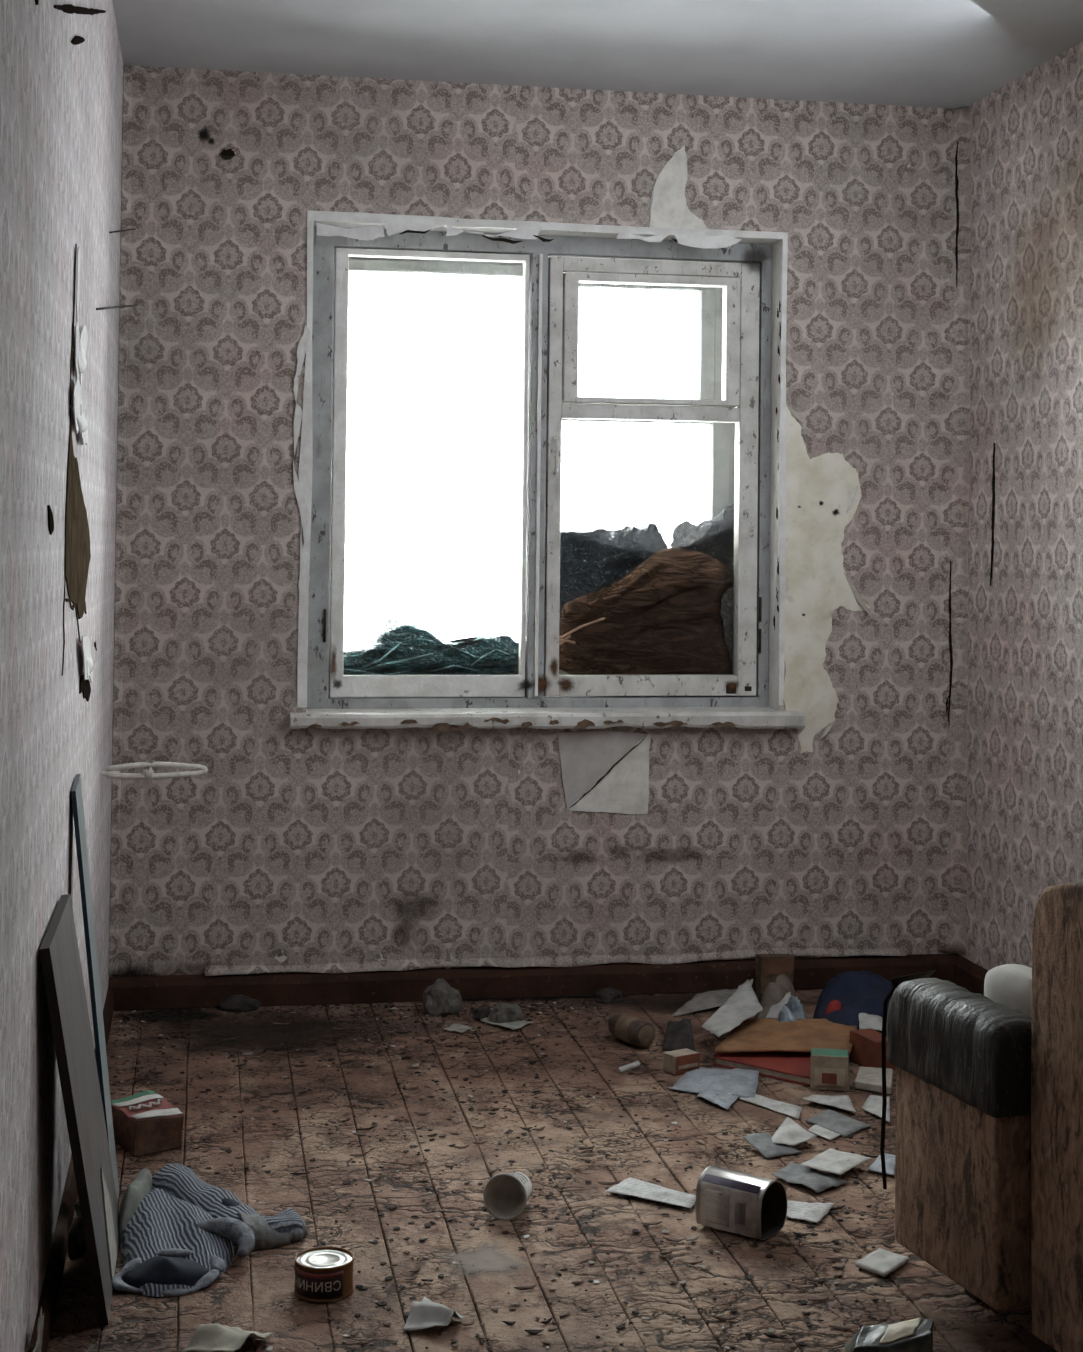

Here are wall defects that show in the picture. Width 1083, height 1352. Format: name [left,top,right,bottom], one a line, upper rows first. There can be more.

peeling [317,222,554,244]
peeling [616,145,742,249]
crack [953,142,961,288]
peeling [773,403,871,753]
crack [945,561,953,725]
crack [988,443,996,586]
peeling [401,717,532,732]
peeling [549,719,688,814]